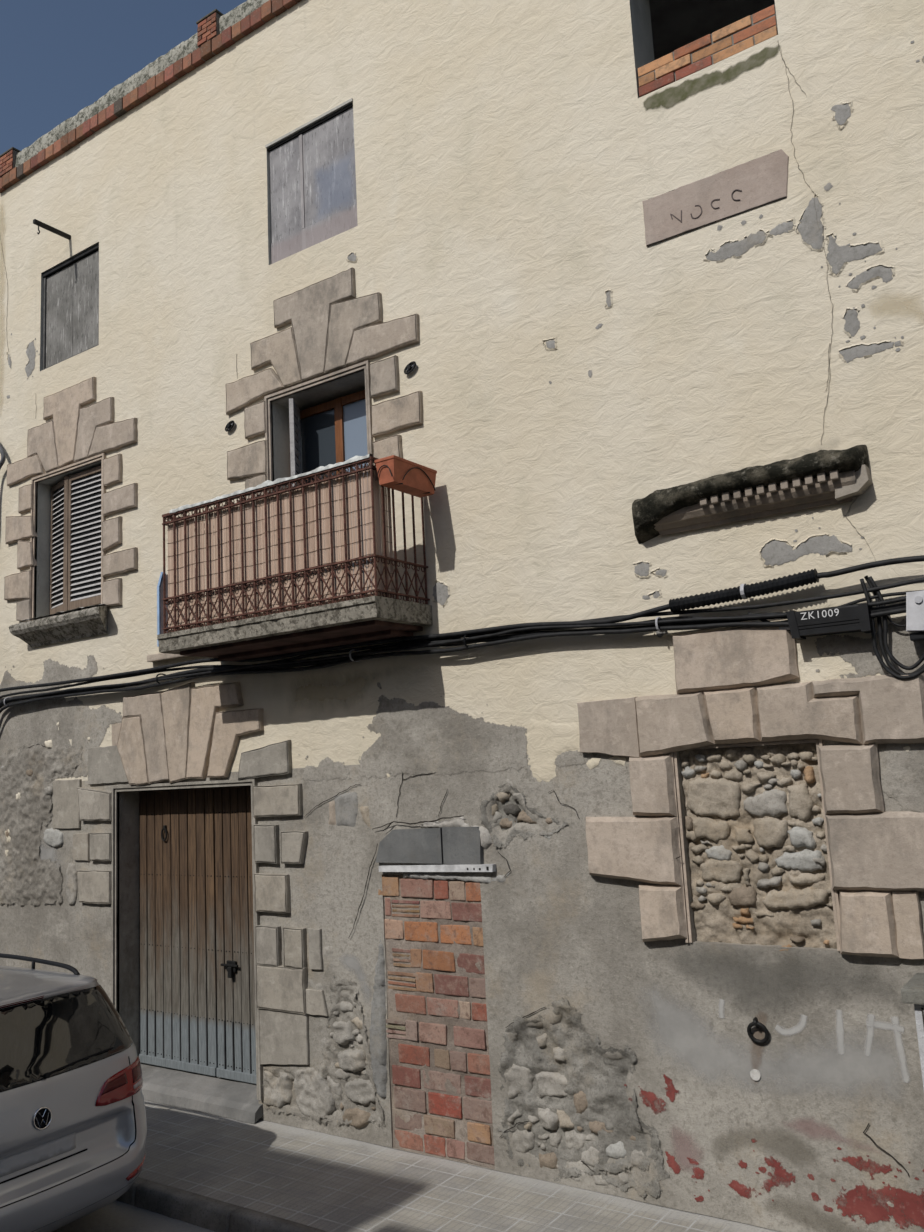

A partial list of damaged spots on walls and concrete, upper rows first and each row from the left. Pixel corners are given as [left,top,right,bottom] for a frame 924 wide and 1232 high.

peeling [703,183,904,363]
peeling [759,517,864,568]
spalling [0,655,123,907]
crack [349,772,464,937]
peeling [301,677,568,849]
peeling [555,750,627,770]
spalling [263,946,385,1129]
spalling [497,997,710,1202]
peeling [727,1138,924,1229]